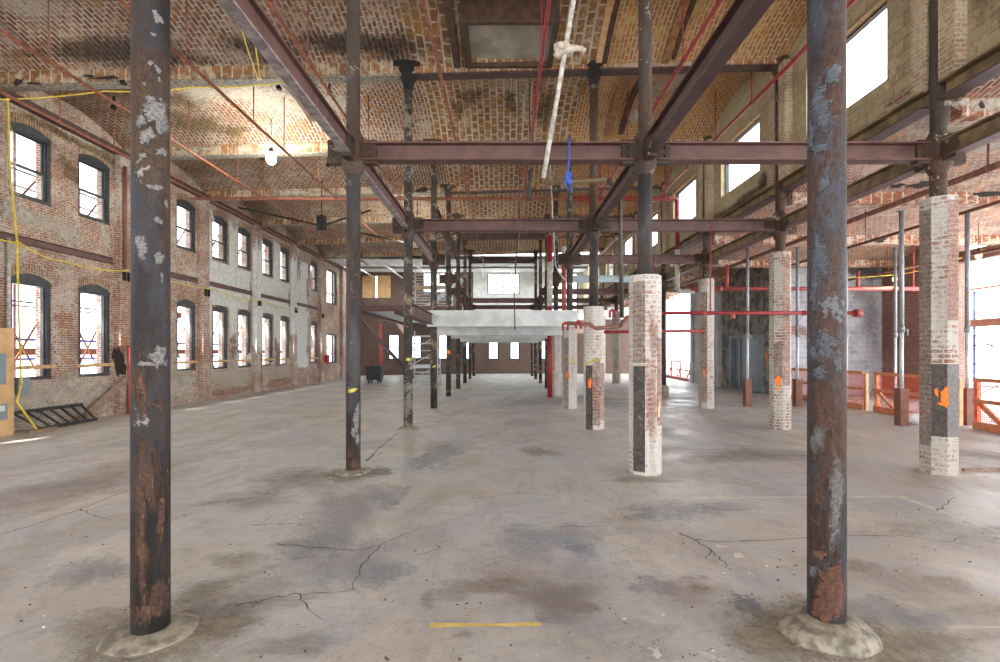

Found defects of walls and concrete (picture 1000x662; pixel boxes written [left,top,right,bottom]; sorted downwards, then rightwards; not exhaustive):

peeling [150,9,164,36]
peeling [135,82,169,158]
peeling [806,62,843,155]
peeling [143,184,168,224]
peeling [134,235,166,283]
peeling [774,256,843,385]
peeling [112,345,168,376]
peeling [350,401,360,445]
rust [130,436,169,625]
crack [235,512,440,620]
crack [472,493,807,570]
rust [811,550,847,624]